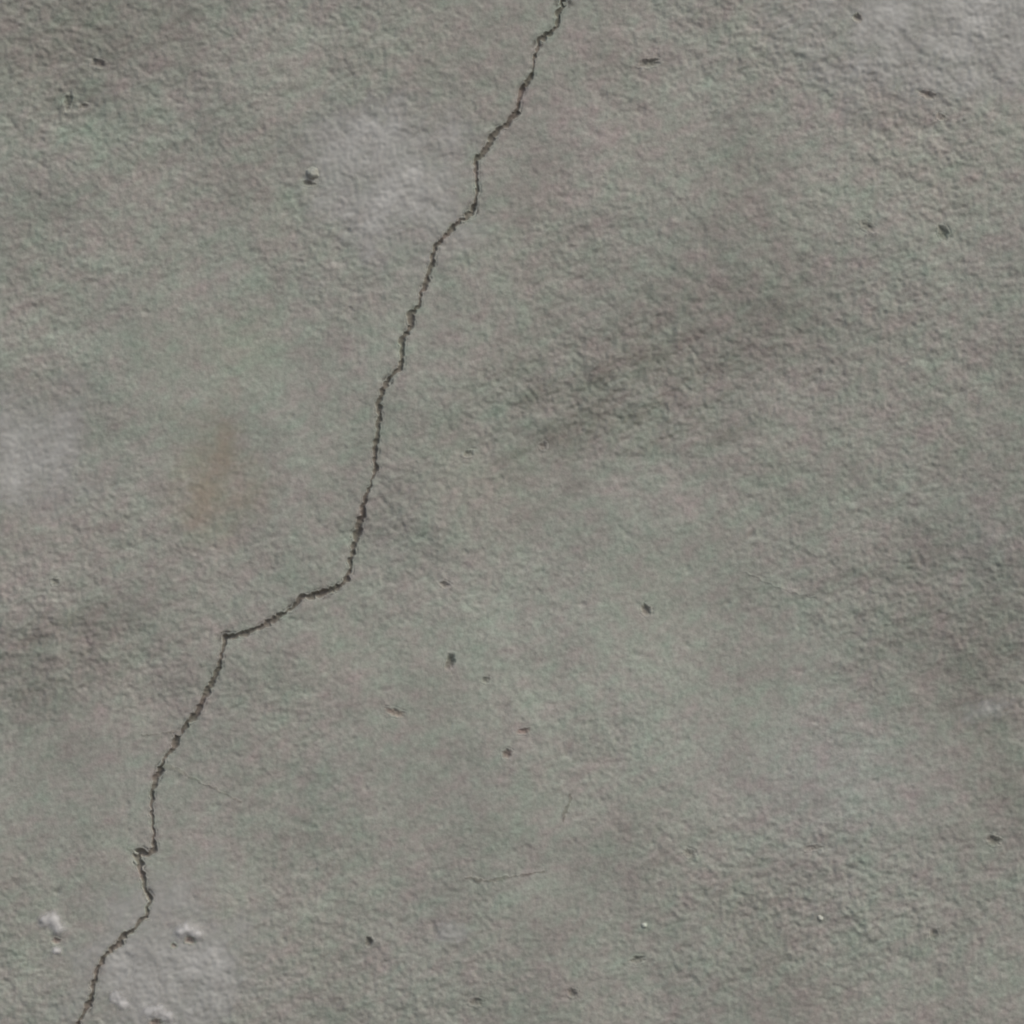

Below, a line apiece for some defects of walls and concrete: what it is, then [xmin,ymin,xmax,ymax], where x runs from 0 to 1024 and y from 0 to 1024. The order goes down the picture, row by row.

crack [74,0,571,1024]